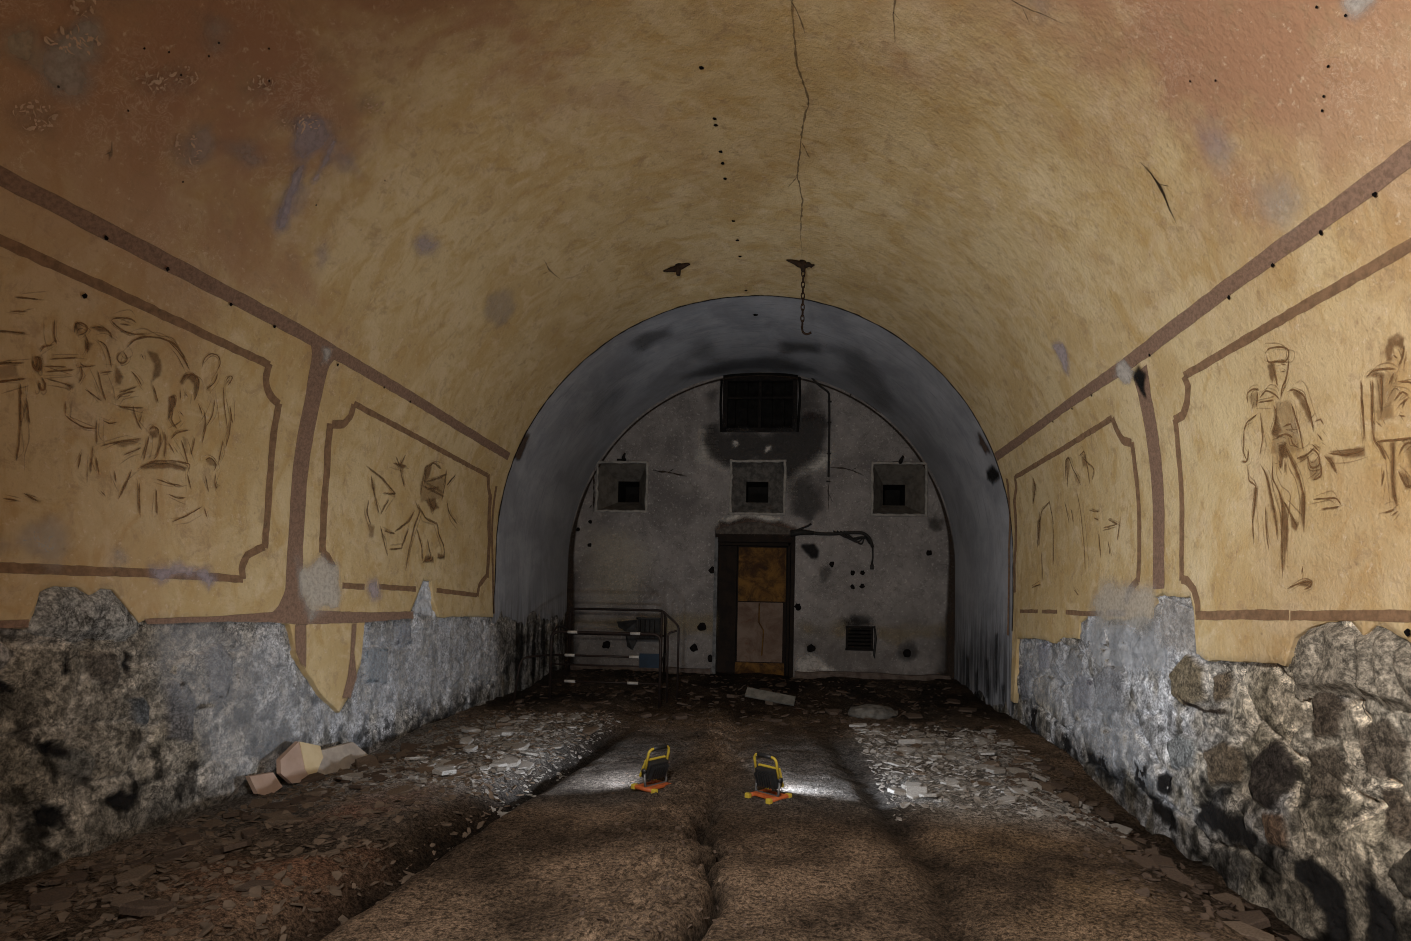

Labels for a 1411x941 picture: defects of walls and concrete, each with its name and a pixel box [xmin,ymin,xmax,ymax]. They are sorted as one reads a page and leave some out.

crack [789,7,809,220]
crack [1144,166,1173,216]
damp [700,414,827,519]